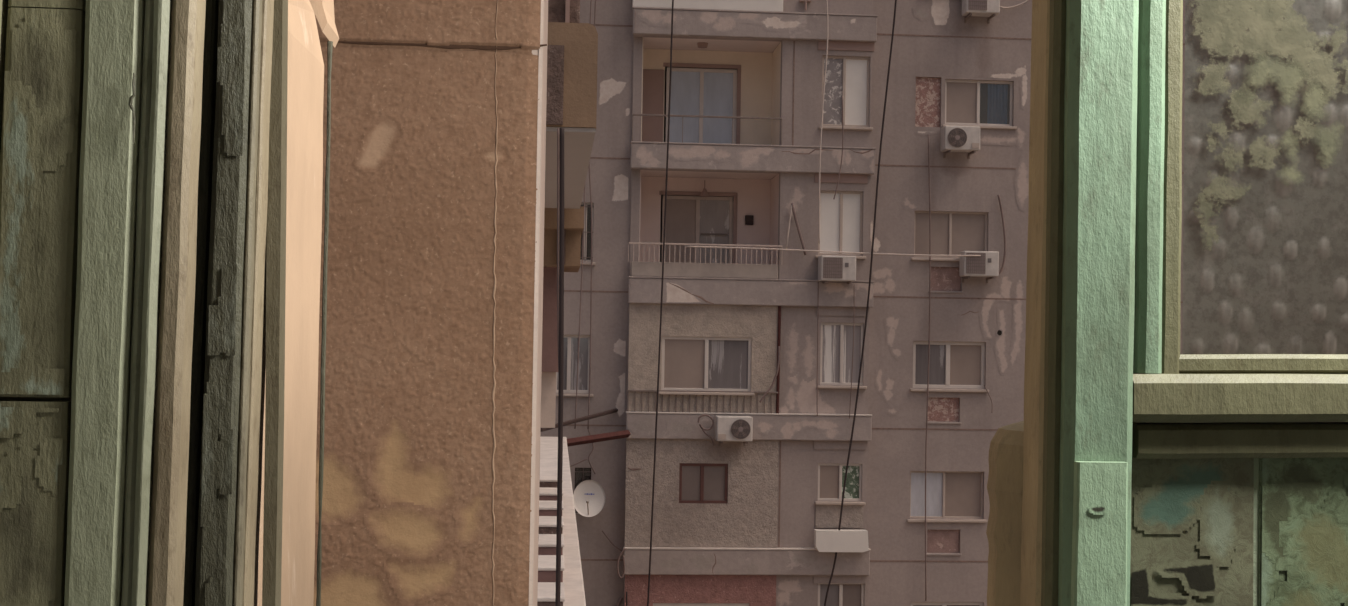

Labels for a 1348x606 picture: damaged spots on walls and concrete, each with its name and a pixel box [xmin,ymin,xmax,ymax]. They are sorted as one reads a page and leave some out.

peeling [929,0,952,27]
peeling [597,76,630,119]
peeling [609,144,874,203]
peeling [784,218,897,302]
peeling [754,319,841,440]
peeling [874,314,903,416]
peeling [979,275,1025,375]